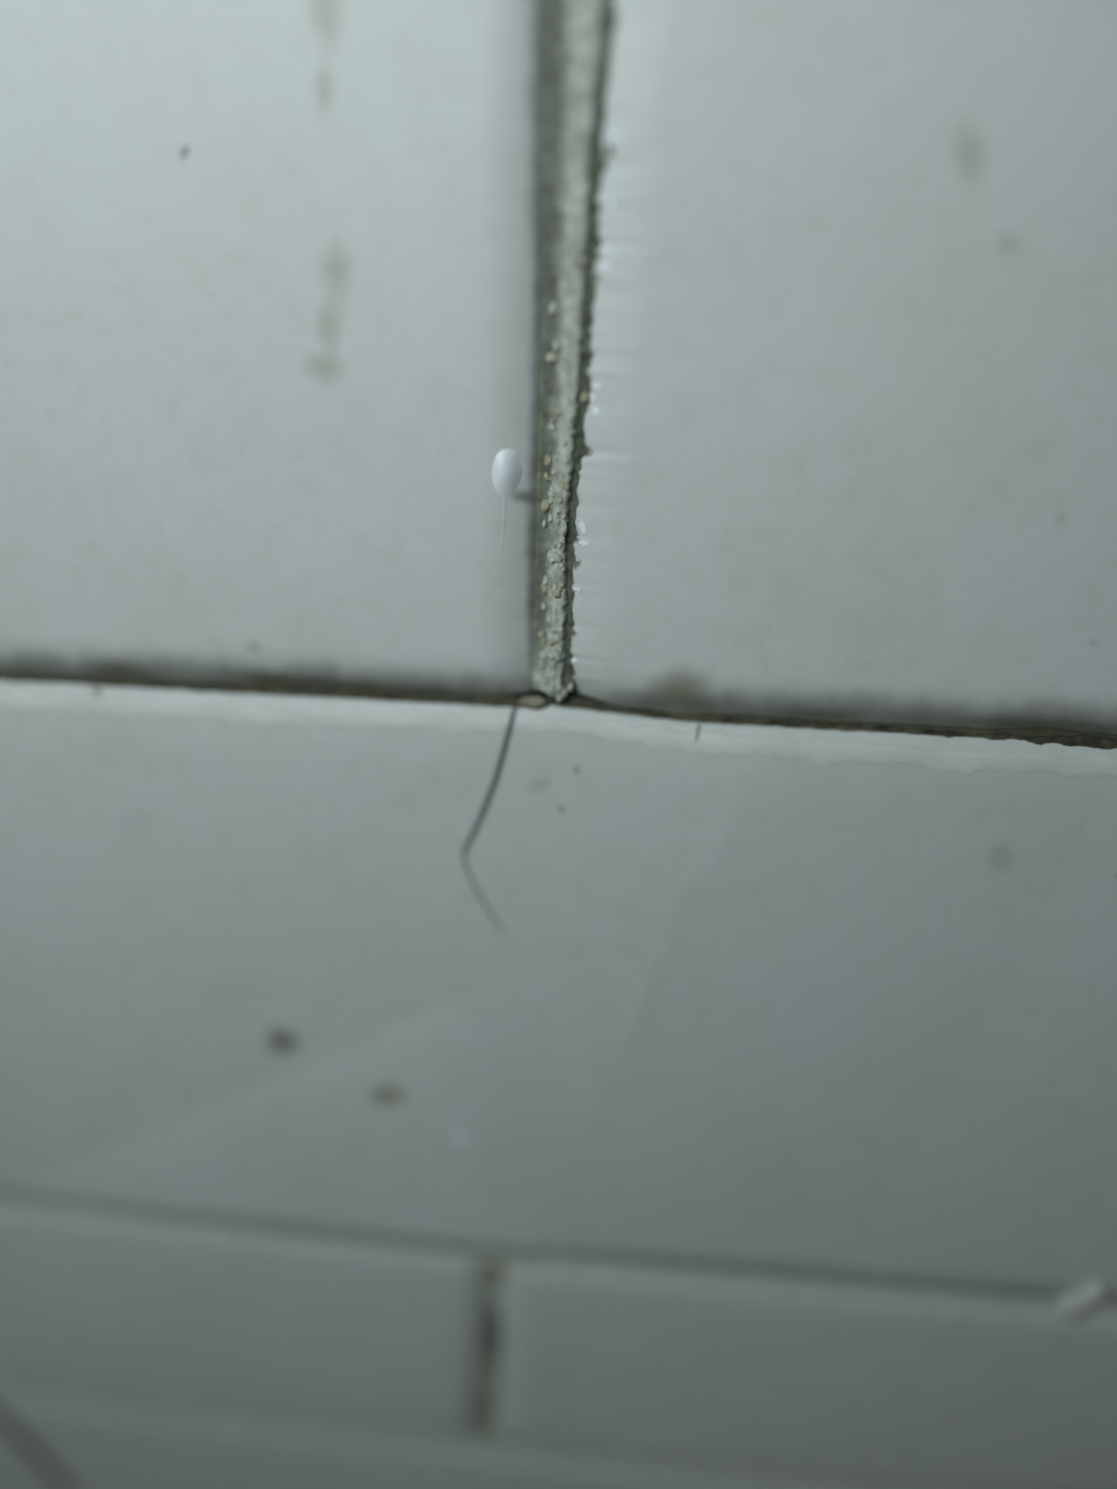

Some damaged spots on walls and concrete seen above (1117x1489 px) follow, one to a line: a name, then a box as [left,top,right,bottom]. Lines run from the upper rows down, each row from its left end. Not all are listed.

crack [463,706,517,856]